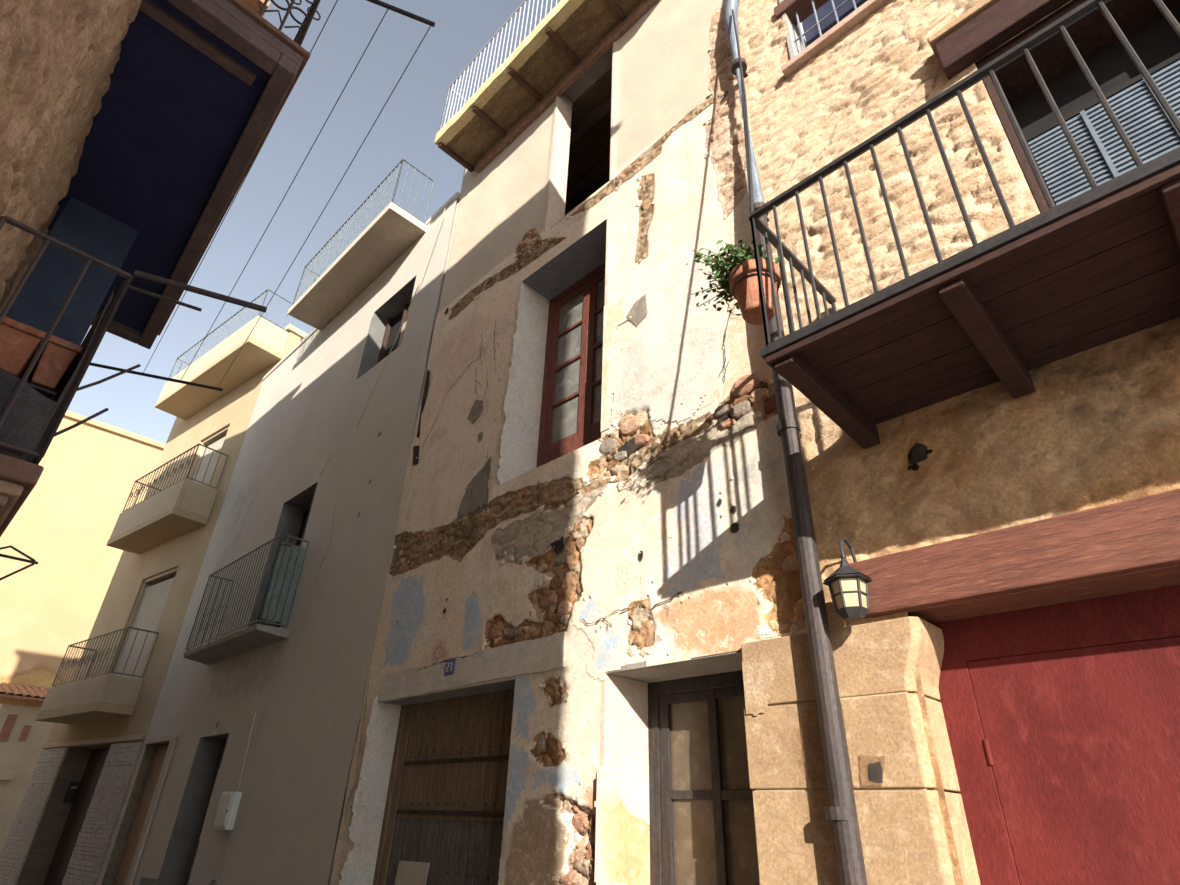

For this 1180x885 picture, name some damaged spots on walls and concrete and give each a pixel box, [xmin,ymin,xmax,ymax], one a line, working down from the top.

flaking render [704,6,748,219]
spalling [515,227,550,260]
spalling [635,174,656,262]
spalling [479,293,774,657]
crack [580,589,685,630]
spalling [749,496,806,638]
spalling [538,674,570,707]
spalling [530,728,572,767]
flaking render [498,783,596,885]